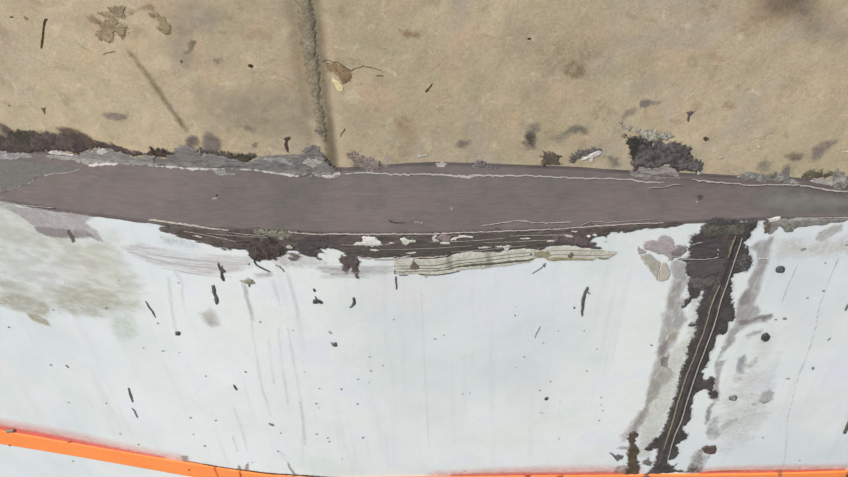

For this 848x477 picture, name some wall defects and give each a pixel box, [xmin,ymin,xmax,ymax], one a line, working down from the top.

spalling [618,121,704,180]
peeling [354,231,617,278]
peeling [640,253,671,281]